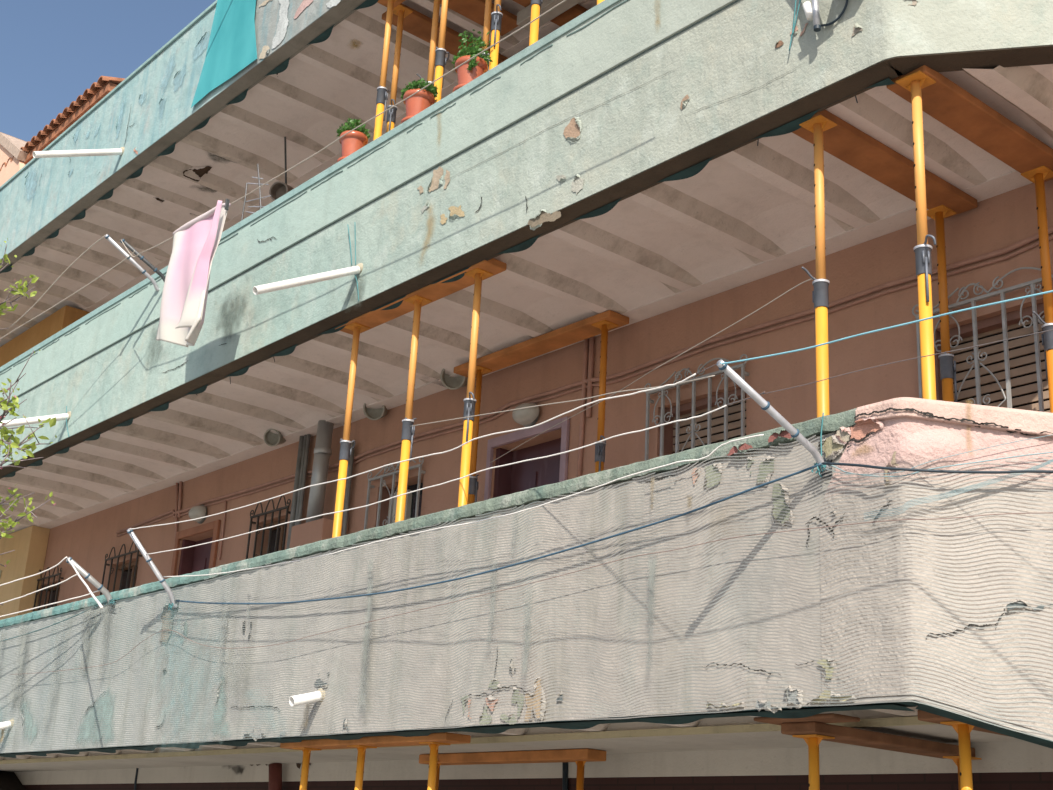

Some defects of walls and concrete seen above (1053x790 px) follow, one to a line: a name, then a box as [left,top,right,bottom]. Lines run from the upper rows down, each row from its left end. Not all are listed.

peeling [259,0,313,59]
peeling [563,117,582,142]
peeling [417,167,450,213]
peeling [440,205,465,225]
spalling [527,209,561,230]
peeling [818,417,884,460]
crack [835,407,1053,449]
crack [806,513,845,547]
crack [926,613,1004,637]
crack [702,661,813,679]
peeling [460,659,563,725]